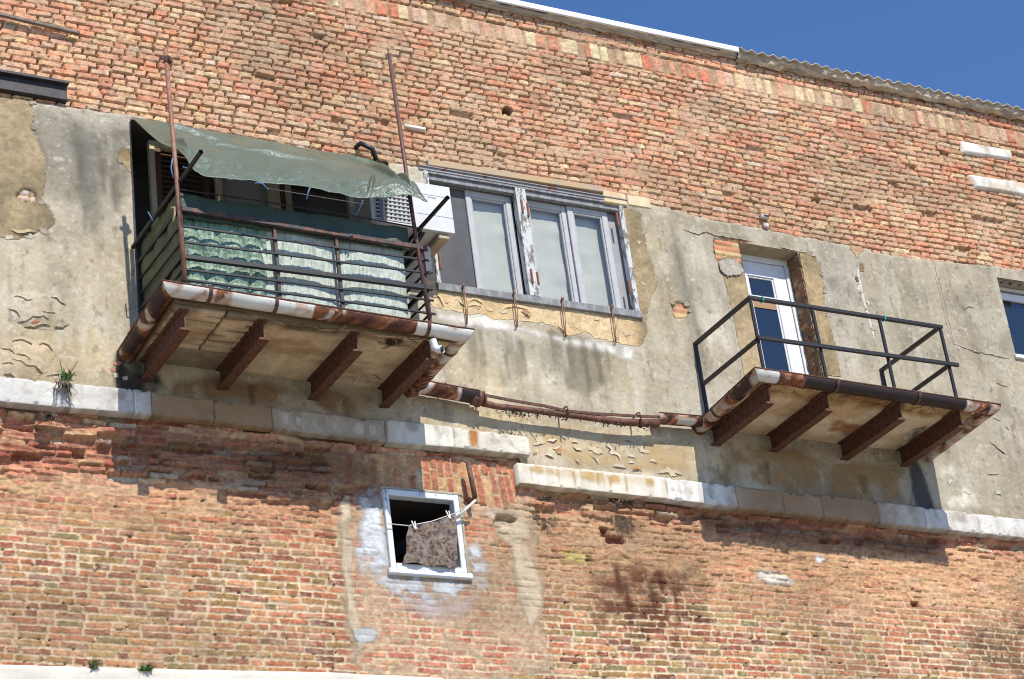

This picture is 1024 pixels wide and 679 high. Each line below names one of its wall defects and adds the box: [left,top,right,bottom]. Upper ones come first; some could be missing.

spalling [0,97,55,240]
peeling [428,206,658,346]
spalling [669,301,692,319]
spalling [713,238,761,375]
peeling [533,435,686,477]
leakage [361,507,386,566]